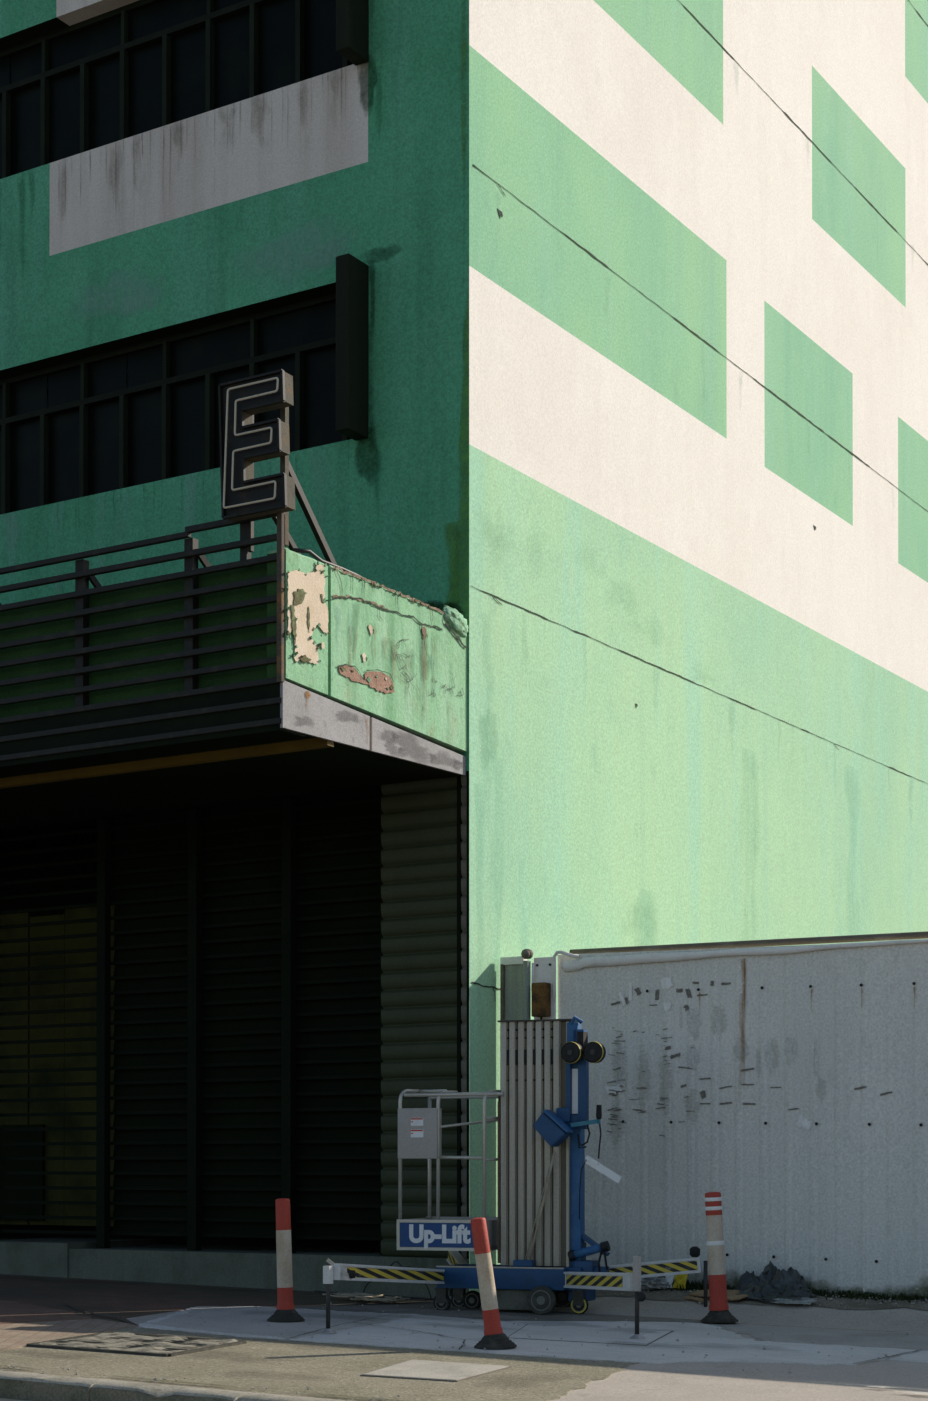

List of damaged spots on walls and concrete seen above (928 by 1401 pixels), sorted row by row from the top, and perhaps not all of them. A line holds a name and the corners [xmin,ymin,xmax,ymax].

peeling [286,561,444,665]
spalling [338,653,394,694]